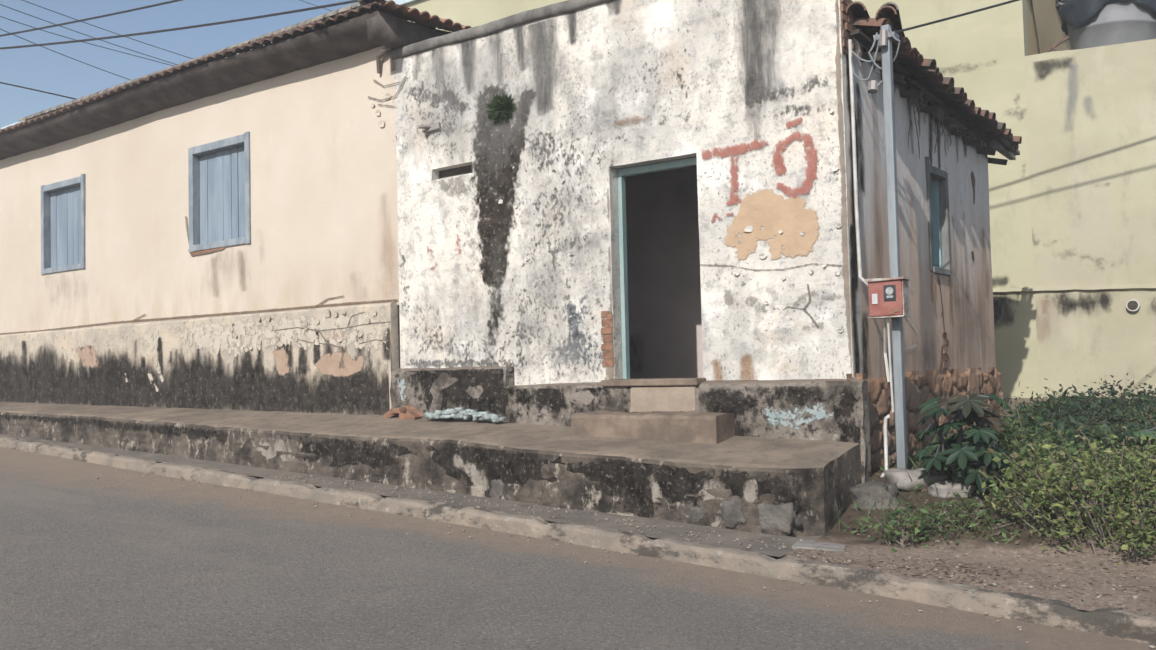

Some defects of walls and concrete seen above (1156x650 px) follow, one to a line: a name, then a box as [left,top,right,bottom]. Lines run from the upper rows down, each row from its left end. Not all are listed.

leakage [417,32,499,115]
leakage [508,20,554,176]
leakage [742,0,777,101]
peeling [724,0,852,371]
spalling [188,247,225,256]
peeling [401,116,644,379]
peeling [143,329,164,392]
leakage [0,329,389,442]
peeling [172,308,388,377]
leakage [408,368,611,422]
peeling [630,387,696,413]
leakage [299,436,799,537]